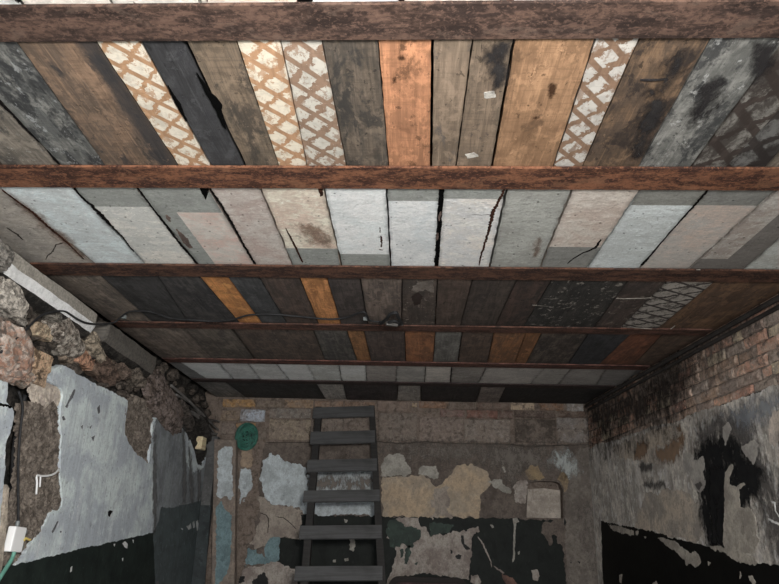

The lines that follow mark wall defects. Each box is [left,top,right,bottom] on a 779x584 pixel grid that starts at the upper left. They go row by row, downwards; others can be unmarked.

crack [197,73,226,129]
crack [472,189,505,265]
crack [641,190,709,266]
spalling [0,382,75,573]
spalling [125,394,153,463]
spalling [182,422,207,466]
peeling [238,496,303,584]
peeling [381,464,545,584]
peeling [710,464,760,584]